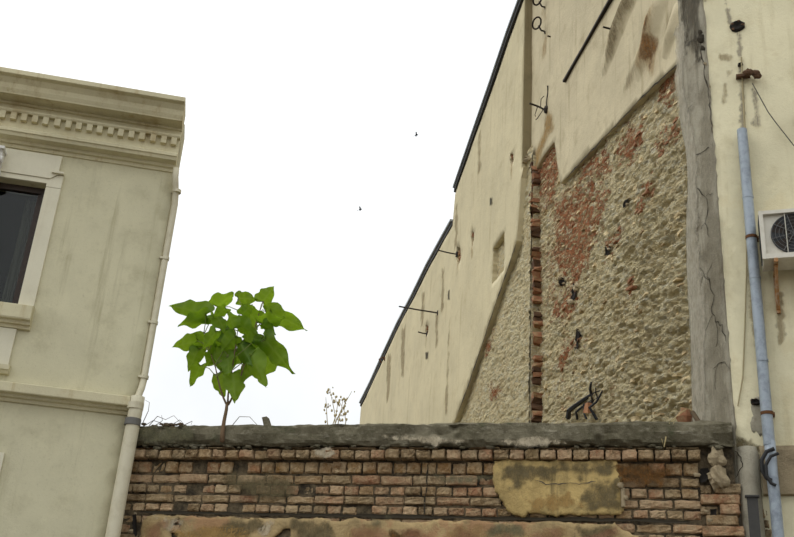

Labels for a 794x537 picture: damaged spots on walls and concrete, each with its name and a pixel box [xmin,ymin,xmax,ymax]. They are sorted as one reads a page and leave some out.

water stain [605,0,629,57]
rust [639,16,657,67]
water stain [681,0,700,62]
water stain [739,89,759,127]
spalling [460,69,693,424]
flaking render [128,512,638,537]